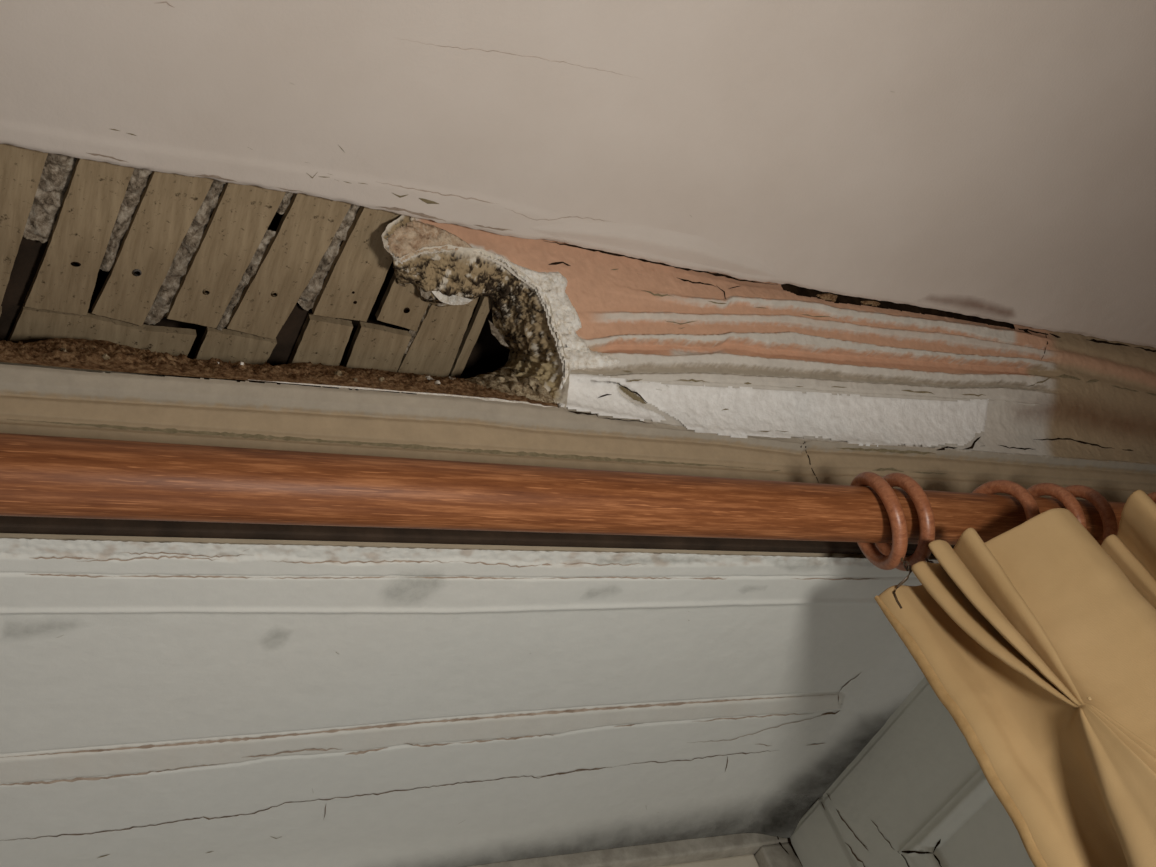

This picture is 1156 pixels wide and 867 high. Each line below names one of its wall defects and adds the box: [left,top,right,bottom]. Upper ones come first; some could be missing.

flaking render [0,193,989,455]
crack [0,676,857,841]